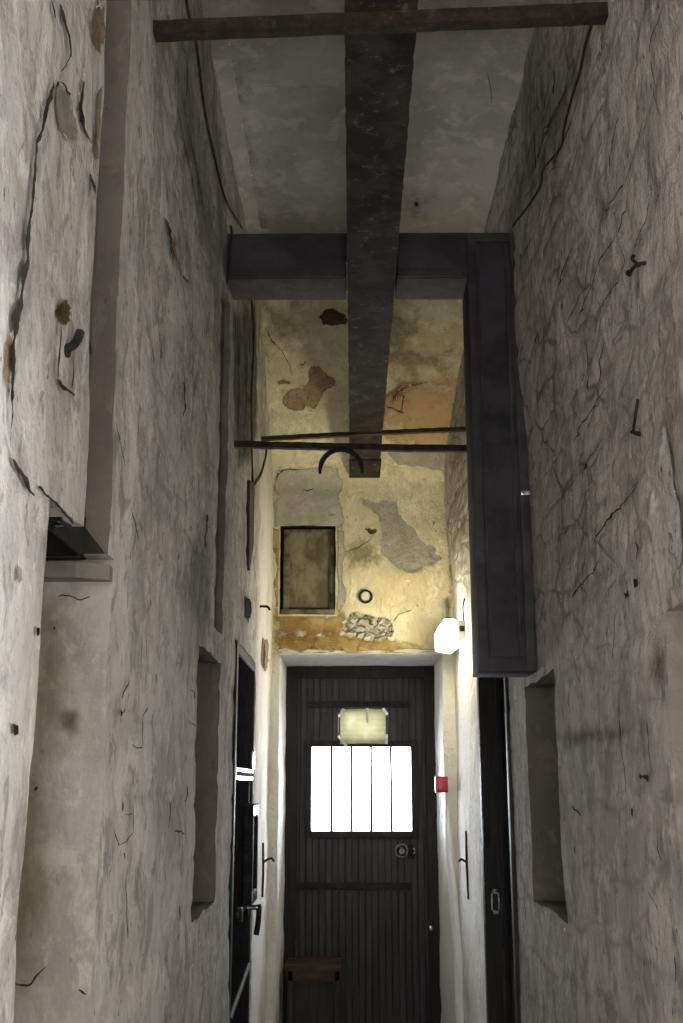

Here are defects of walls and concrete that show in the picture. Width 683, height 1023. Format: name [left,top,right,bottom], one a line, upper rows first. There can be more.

spalling [91,3,106,53]
spalling [55,84,78,141]
crack [10,0,92,524]
spalling [57,299,71,325]
spalling [319,308,348,328]
spalling [283,365,336,411]
peeling [261,466,442,671]
damp [274,610,421,654]